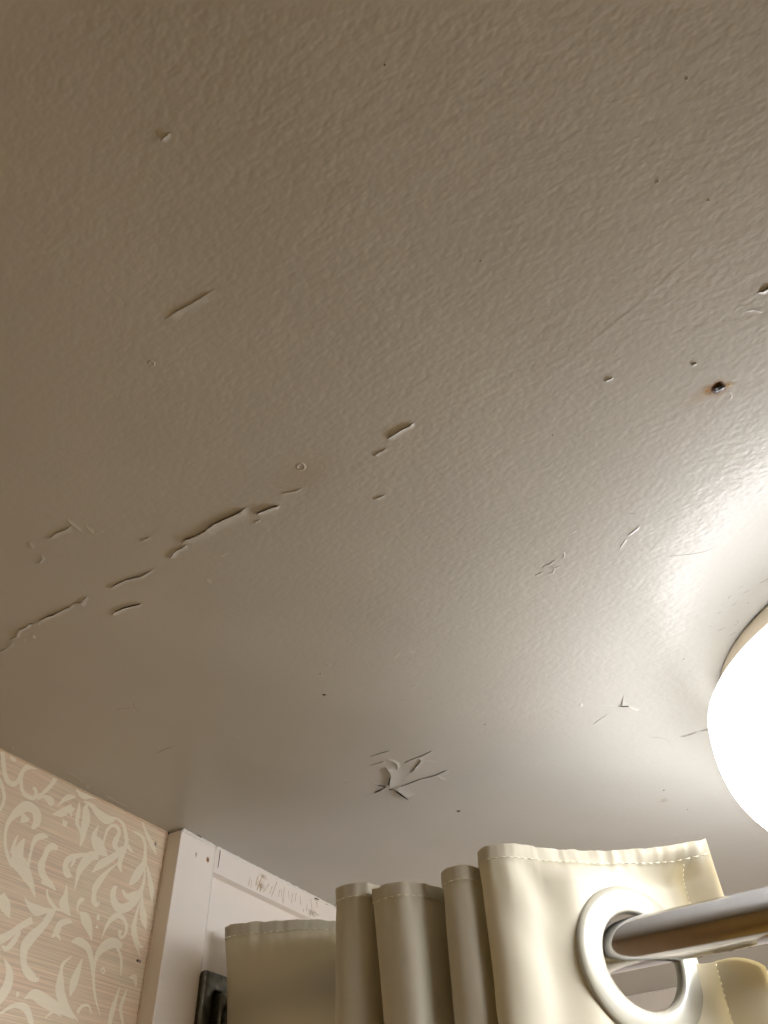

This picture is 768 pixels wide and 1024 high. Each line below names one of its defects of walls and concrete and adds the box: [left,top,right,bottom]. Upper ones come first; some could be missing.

rust [706,381,734,400]
peeling [369,750,451,800]